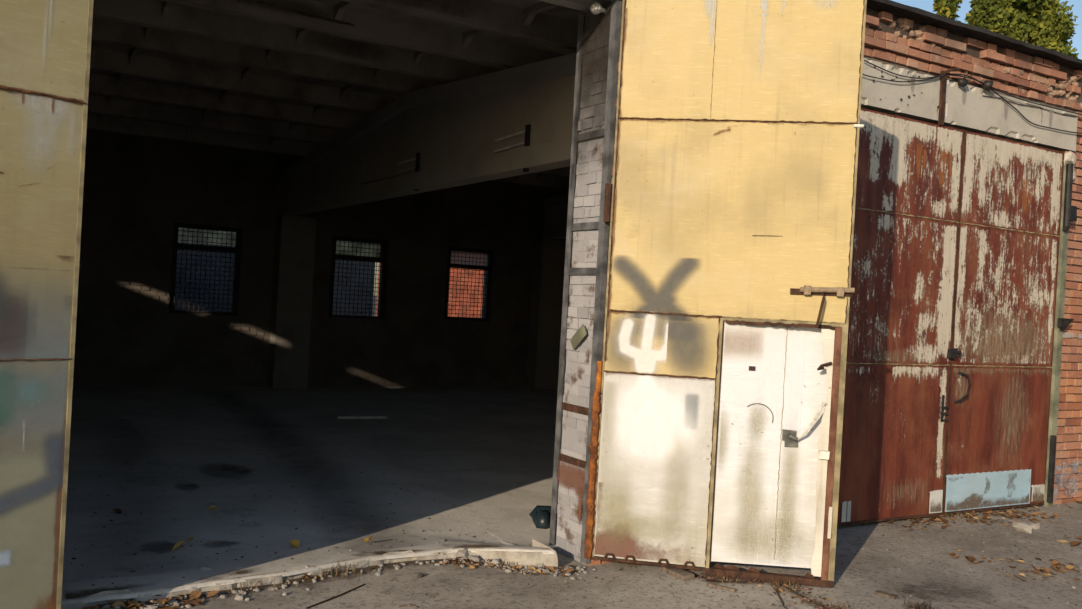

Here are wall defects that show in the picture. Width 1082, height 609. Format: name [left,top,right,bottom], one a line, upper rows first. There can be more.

spalling [865,18,937,47]
rust [2,86,84,112]
spalling [962,63,1082,109]
rust [611,8,707,265]
rust [939,149,952,185]
peeling [849,111,1082,479]
rust [606,278,701,380]
rust [595,529,660,559]